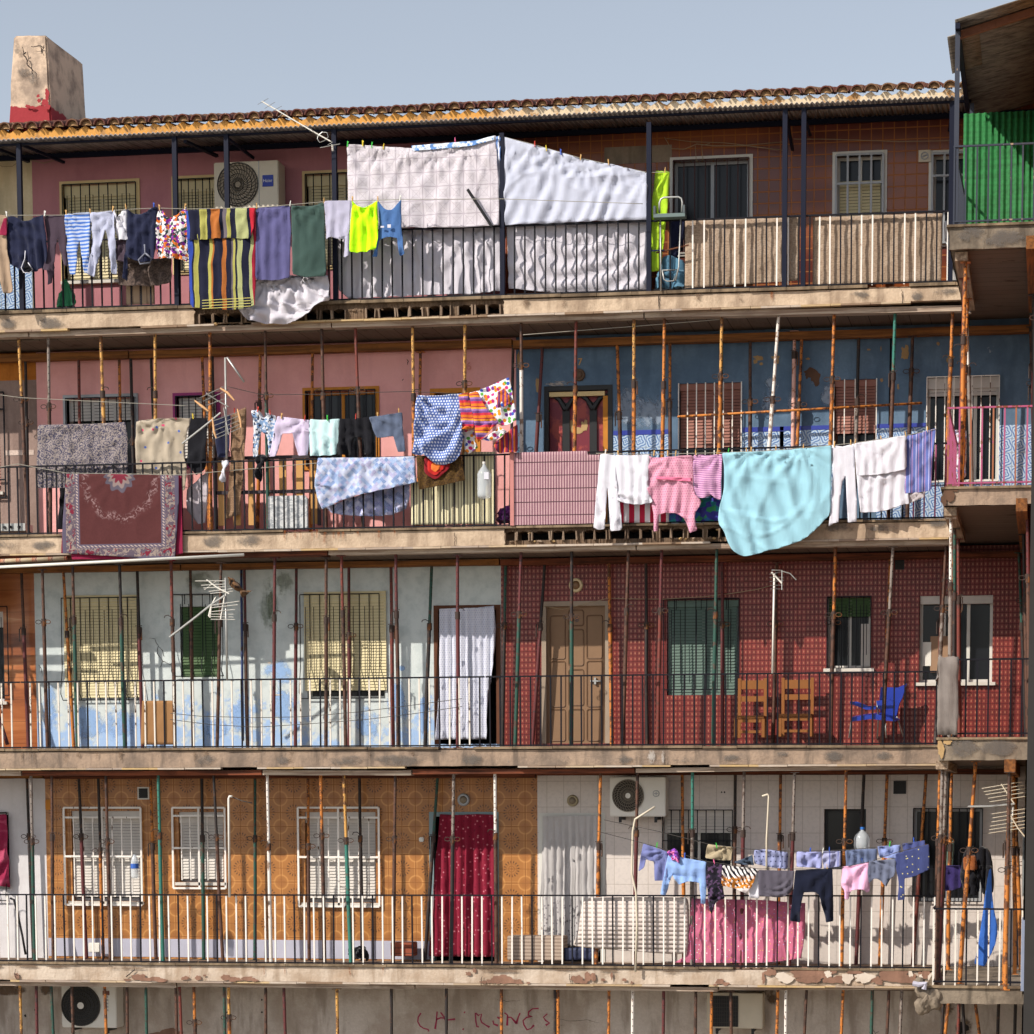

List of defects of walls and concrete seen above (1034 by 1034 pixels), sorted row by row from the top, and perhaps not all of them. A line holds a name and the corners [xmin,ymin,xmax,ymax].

crack [22,45,45,74]
spalling [803,358,830,404]
peeling [762,967,932,985]